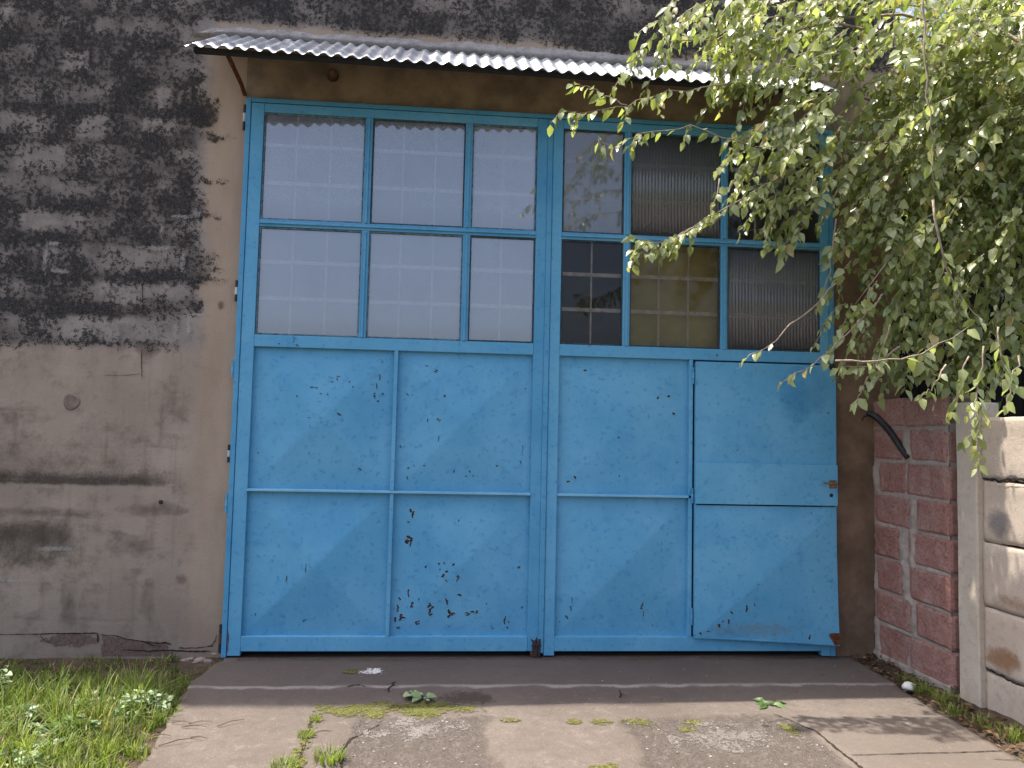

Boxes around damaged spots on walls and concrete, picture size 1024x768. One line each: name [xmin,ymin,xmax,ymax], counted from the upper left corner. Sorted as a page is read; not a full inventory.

water stain [0,0,894,352]
water stain [0,472,161,485]
crack [981,473,1024,483]
flaking render [41,634,173,656]
rust [829,633,840,645]
rust [987,649,1018,671]
crack [986,667,1024,687]